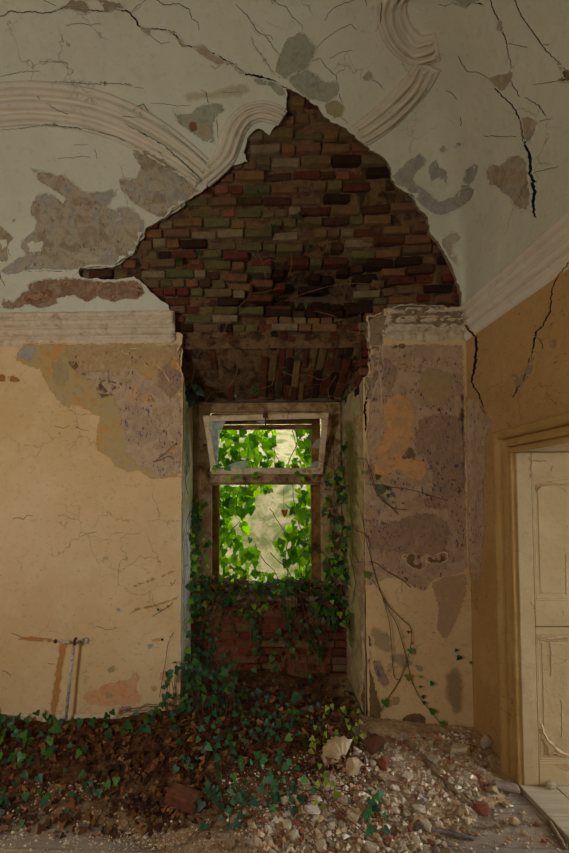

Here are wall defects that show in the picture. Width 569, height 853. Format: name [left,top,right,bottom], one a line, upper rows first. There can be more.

crack [0,0,384,185]
crack [438,0,569,217]
spalling [0,29,539,641]
peeling [82,663,143,714]